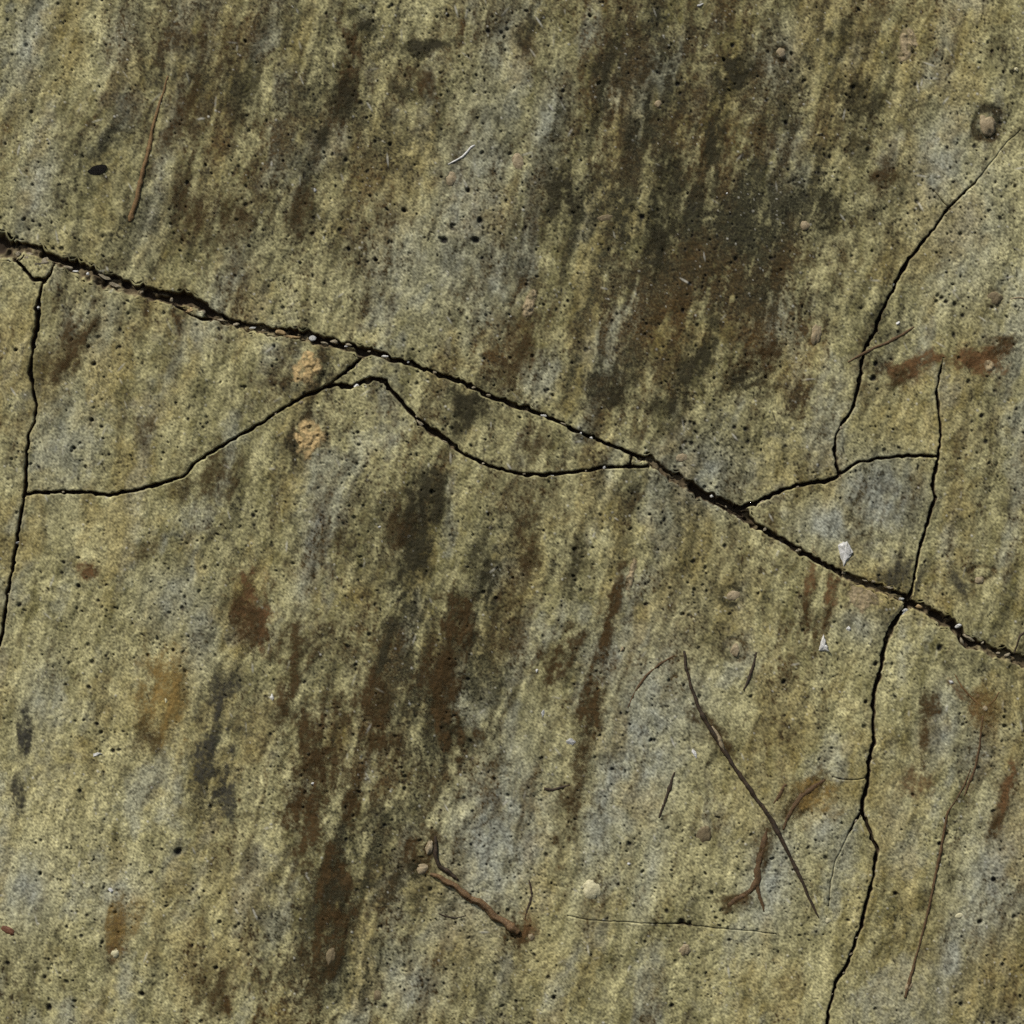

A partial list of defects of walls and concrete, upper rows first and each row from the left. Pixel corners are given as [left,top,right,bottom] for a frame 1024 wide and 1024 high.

water stain [544,162,580,226]
water stain [446,383,487,435]
crack [0,129,1024,671]
water stain [650,312,719,434]
water stain [726,339,781,389]
corrosion [887,335,1016,389]
water stain [388,467,451,584]
water stain [413,582,485,762]
water stain [536,560,628,812]
water stain [277,619,401,990]
crack [823,603,911,1024]
crack [568,914,776,936]